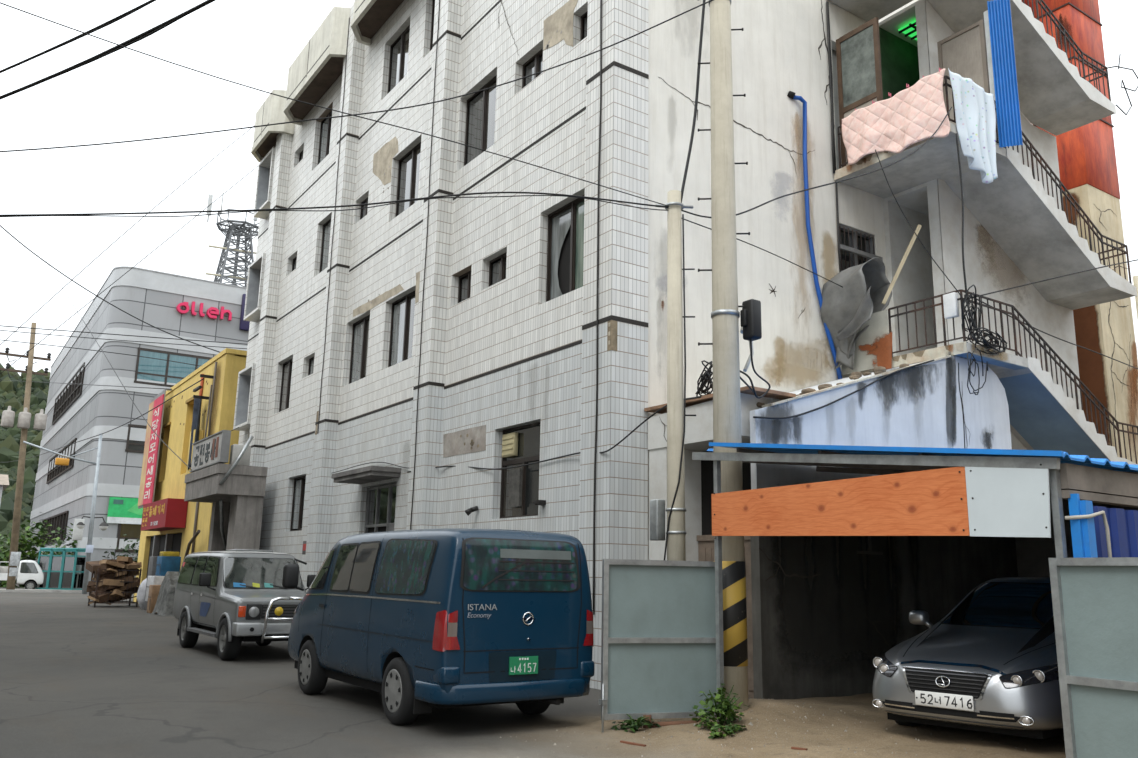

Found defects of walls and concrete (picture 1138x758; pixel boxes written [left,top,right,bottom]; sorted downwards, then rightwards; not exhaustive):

peeling [543,0,578,50]
crack [659,77,710,120]
peeling [373,136,398,193]
crack [733,120,810,171]
rust [859,332,892,369]